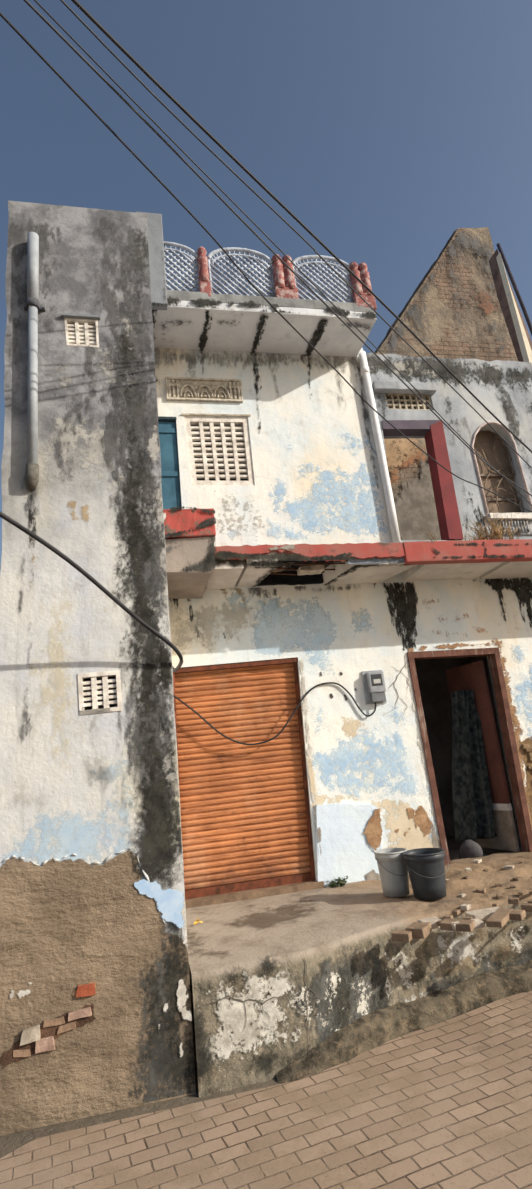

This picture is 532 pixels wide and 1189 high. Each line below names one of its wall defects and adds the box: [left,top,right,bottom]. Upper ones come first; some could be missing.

water stain [7,220,60,305]
water stain [385,231,494,384]
flaking render [147,425,159,461]
water stain [301,306,532,559]
water stain [54,216,287,890]
peeling [156,433,426,628]
water stain [374,582,418,652]
water stain [473,578,532,628]
flaking render [160,729,178,781]
peeling [229,592,532,854]
flaking render [0,801,427,1136]
water stain [258,1046,313,1073]